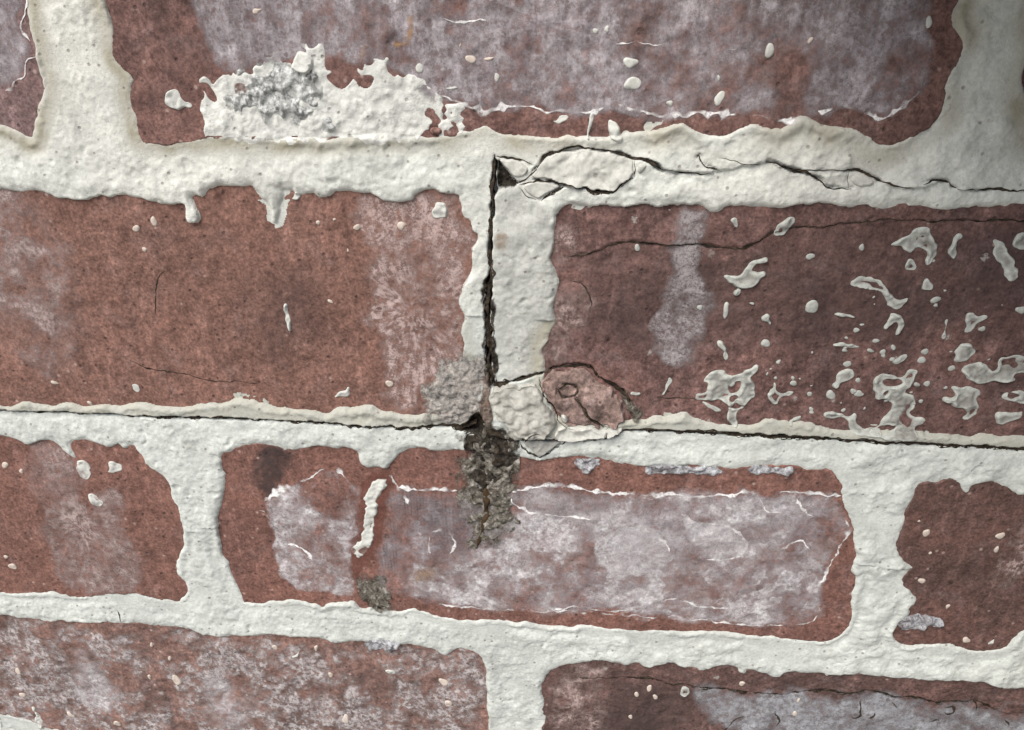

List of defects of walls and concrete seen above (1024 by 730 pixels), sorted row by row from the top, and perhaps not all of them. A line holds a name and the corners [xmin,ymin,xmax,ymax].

peeling [199,44,465,145]
crack [32,145,1024,458]
spalling [420,353,626,456]
efflorescence [260,470,359,595]
efflorescence [381,478,850,626]